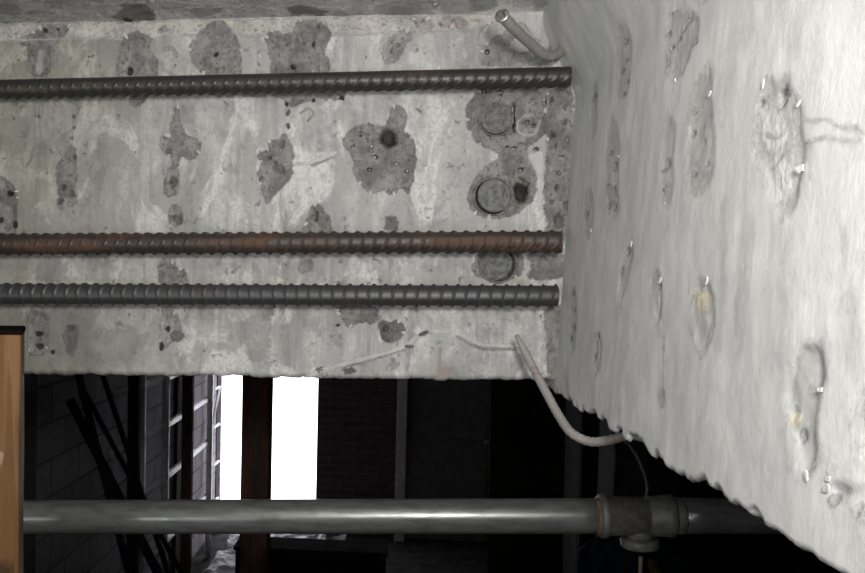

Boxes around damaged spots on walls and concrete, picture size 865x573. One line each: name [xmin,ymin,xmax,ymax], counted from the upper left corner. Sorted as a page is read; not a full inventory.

damp [471,0,496,11]
spalling [761,89,804,204]
spalling [0,0,627,447]